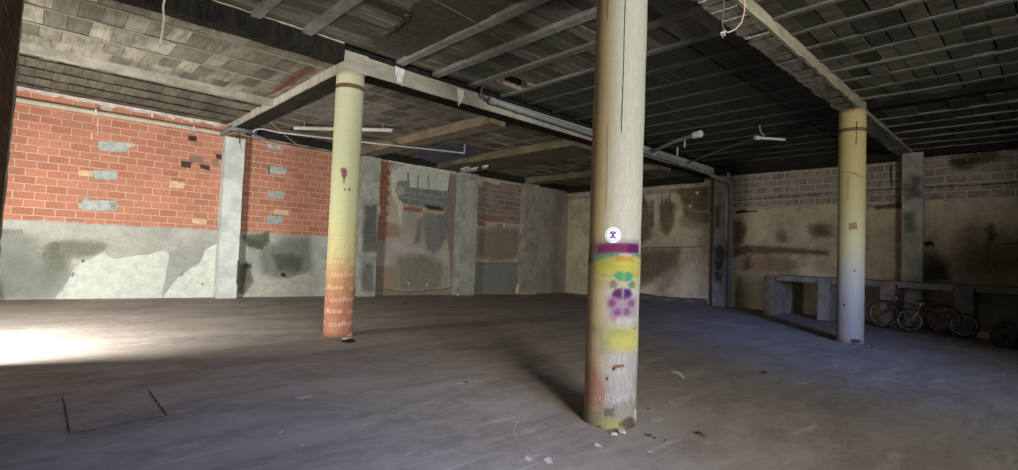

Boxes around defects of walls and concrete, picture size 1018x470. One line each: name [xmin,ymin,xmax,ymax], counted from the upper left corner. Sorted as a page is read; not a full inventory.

damp [47,241,101,257]
peeling [55,243,217,299]
peeling [379,165,450,242]
damp [640,191,709,292]